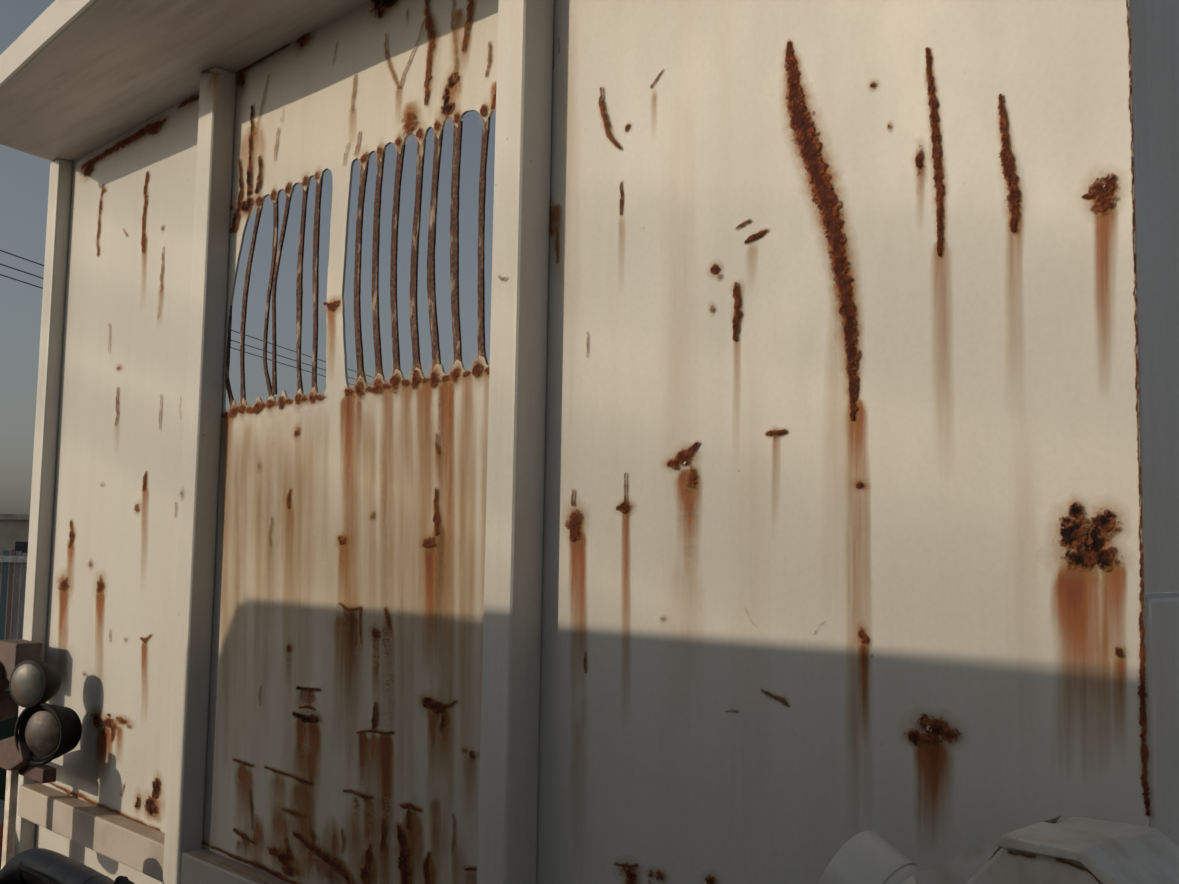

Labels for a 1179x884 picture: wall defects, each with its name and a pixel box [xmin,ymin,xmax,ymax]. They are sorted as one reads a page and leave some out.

corrosion [229,105,319,233]
corrosion [343,0,474,165]
corrosion [784,41,865,489]
corrosion [915,47,944,271]
corrosion [998,94,1021,243]
corrosion [1081,173,1118,322]
corrosion [221,391,324,456]
corrosion [337,359,490,640]
corrosion [564,490,585,636]
corrosion [666,442,699,536]
corrosion [1055,502,1125,694]
corrosion [1126,0,1151,816]